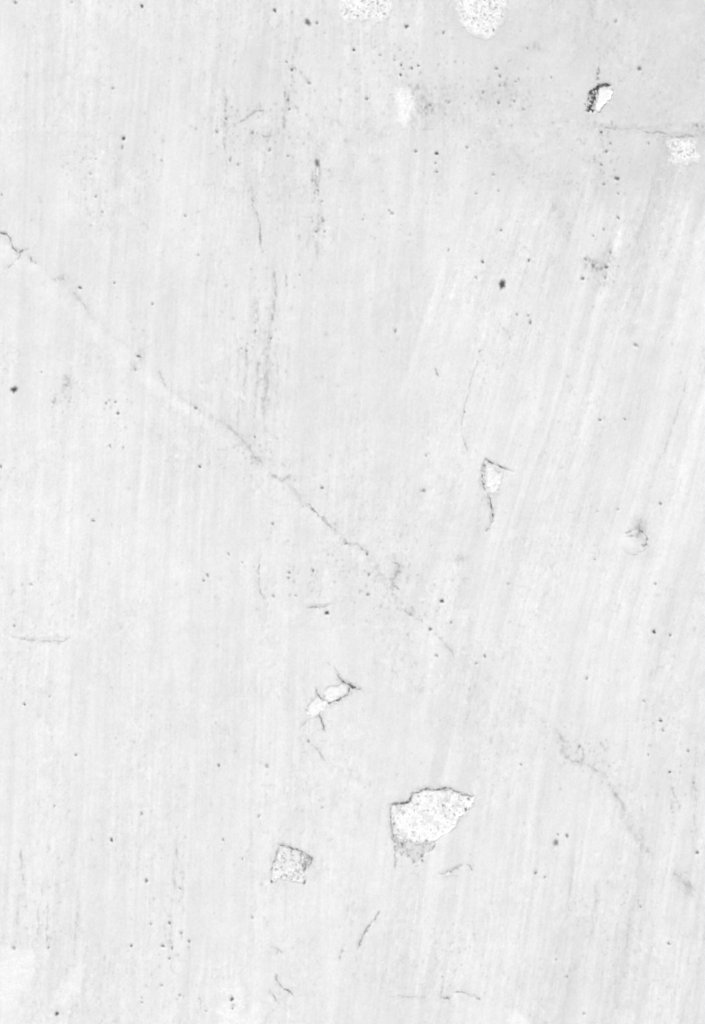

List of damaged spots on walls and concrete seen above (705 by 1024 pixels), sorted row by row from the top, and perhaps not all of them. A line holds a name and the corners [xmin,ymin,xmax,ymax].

peeling [336,0,394,26]
peeling [452,0,511,41]
spalling [588,83,613,112]
peeling [664,133,703,167]
spalling [304,681,360,728]
spalling [389,787,476,861]
spalling [270,844,312,883]